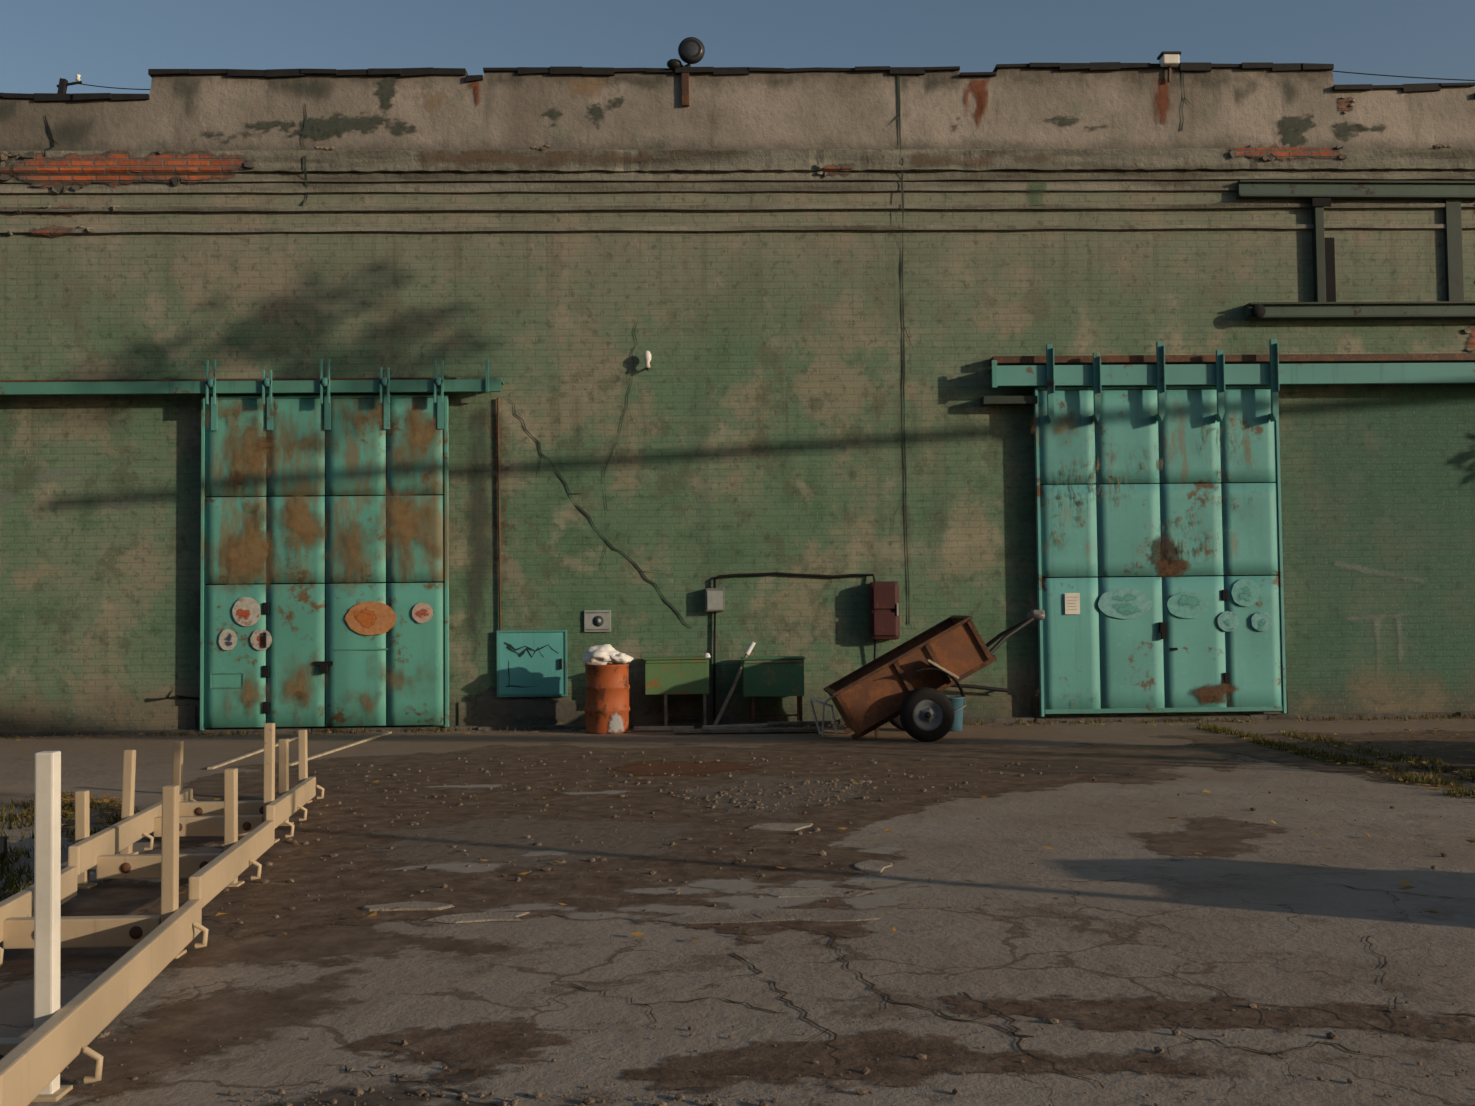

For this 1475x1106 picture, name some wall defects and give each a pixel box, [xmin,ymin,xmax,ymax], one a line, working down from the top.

rust [964,80,988,124]
rust [1156,79,1169,123]
spalling [0,149,257,238]
rust [210,398,319,488]
rust [396,410,439,473]
crack [507,323,692,629]
rust [221,496,325,583]
rust [383,492,438,568]
rust [1152,512,1224,577]
rust [242,678,260,707]
rust [284,664,312,704]
rust [1192,682,1239,703]